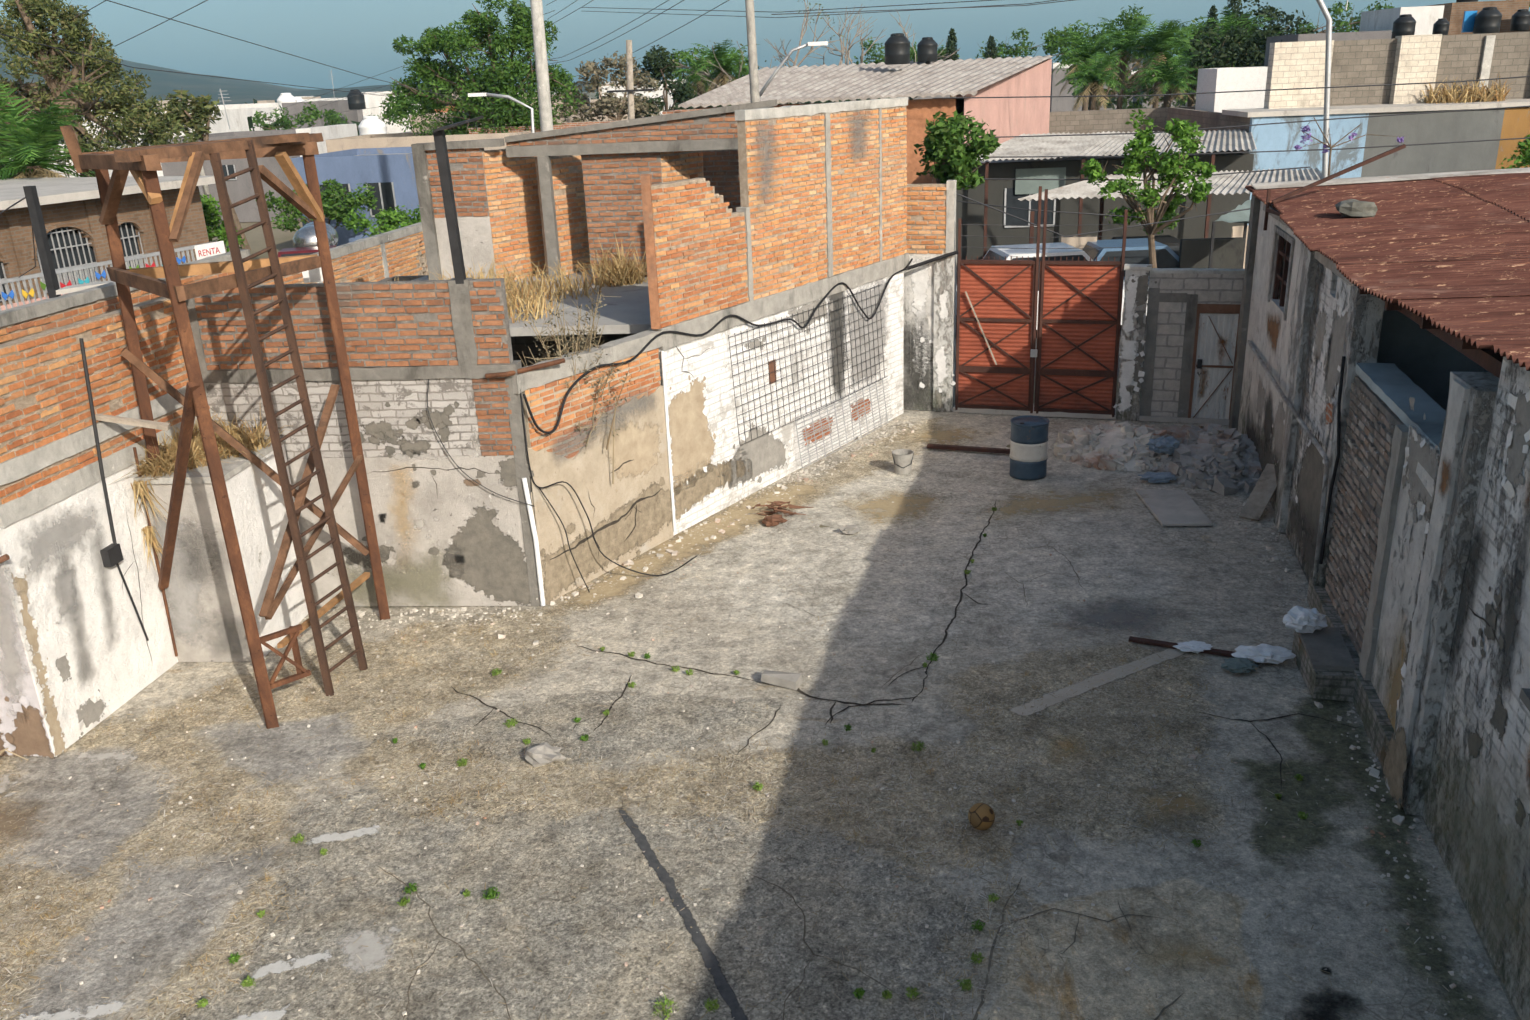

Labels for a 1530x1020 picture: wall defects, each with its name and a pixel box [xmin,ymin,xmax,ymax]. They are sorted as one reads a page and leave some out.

peeling [788,298,834,334]
rust [1267,316,1280,351]
peeling [360,402,460,488]
crack [550,460,662,560]
flaking render [428,375,872,607]
peeling [1495,390,1530,501]
peeling [0,566,110,759]
crack [451,501,1084,755]
flaking render [1382,397,1446,809]
peeling [1468,694,1507,758]
crack [973,878,1164,1020]
crack [1154,994,1182,1020]